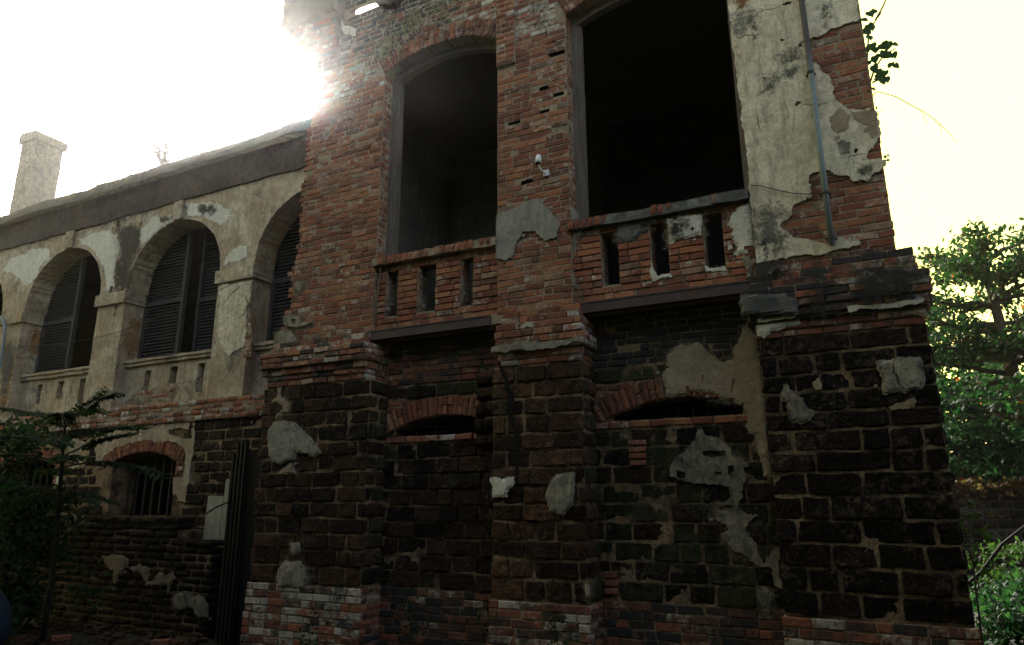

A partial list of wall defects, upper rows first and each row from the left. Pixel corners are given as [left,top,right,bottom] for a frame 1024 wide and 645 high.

leakage [728,9,758,40]
leakage [760,47,802,93]
flaking render [781,23,895,252]
peeling [3,248,50,287]
peeling [77,230,120,290]
leakage [96,176,162,293]
peeling [139,213,173,244]
peeling [186,201,230,225]
peeling [223,245,248,266]
flaking render [267,386,322,477]
flaking render [655,317,783,616]
flaking render [102,554,212,620]